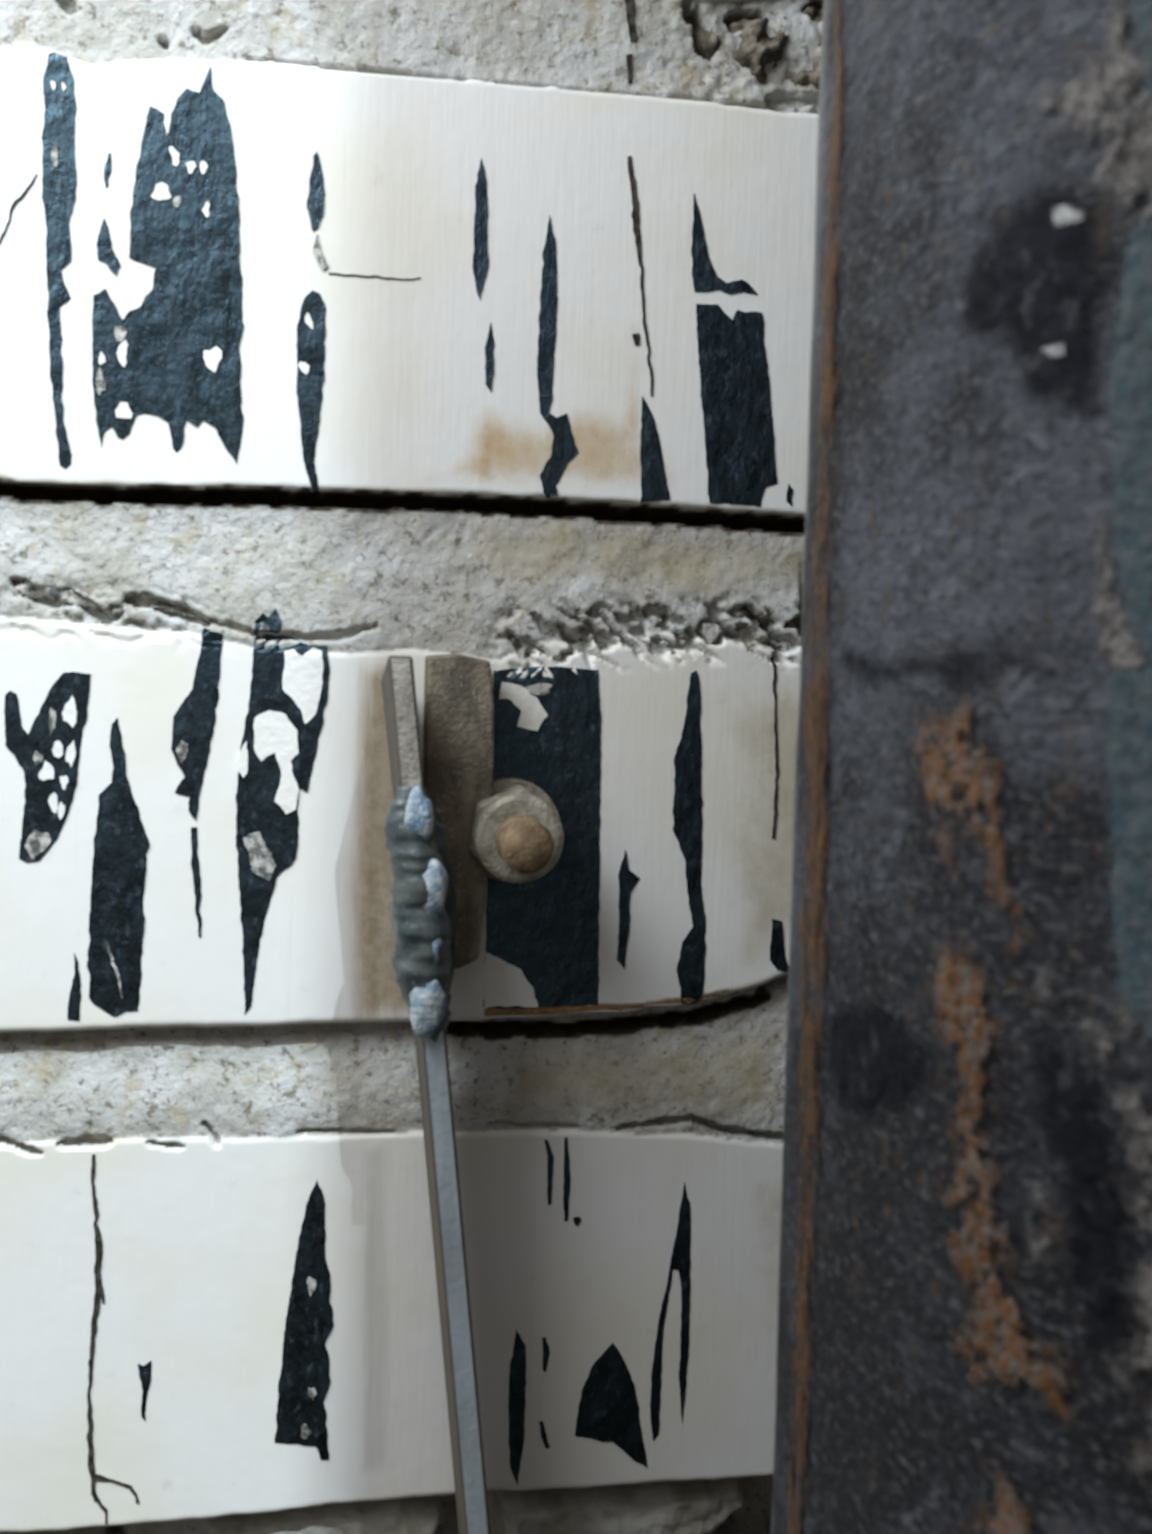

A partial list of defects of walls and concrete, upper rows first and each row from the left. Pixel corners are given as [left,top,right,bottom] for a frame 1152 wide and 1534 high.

peeling [42,52,77,469]
peeling [92,66,244,463]
peeling [691,194,793,507]
peeling [67,717,150,1021]
peeling [4,581,223,937]
peeling [236,608,330,1014]
rust [788,0,842,1534]
rust [914,704,1023,940]
crack [87,1154,140,1524]
peeling [275,1180,334,1460]
rust [933,950,1068,1414]
rust [978,1473,1028,1534]